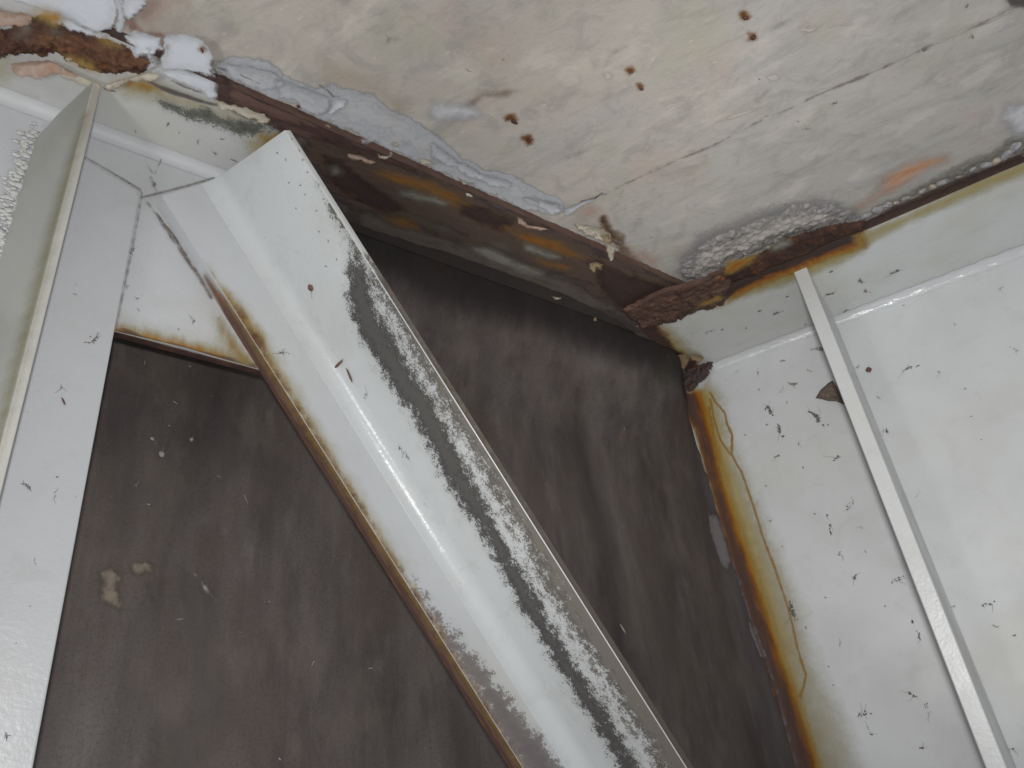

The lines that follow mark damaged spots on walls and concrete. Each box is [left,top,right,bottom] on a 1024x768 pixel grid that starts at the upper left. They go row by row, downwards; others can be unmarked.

peeling [0,0,615,273]
rust [215,73,697,370]
rust [702,153,1024,305]
rust [113,278,523,768]
water stain [325,203,693,768]
rust [686,386,843,768]